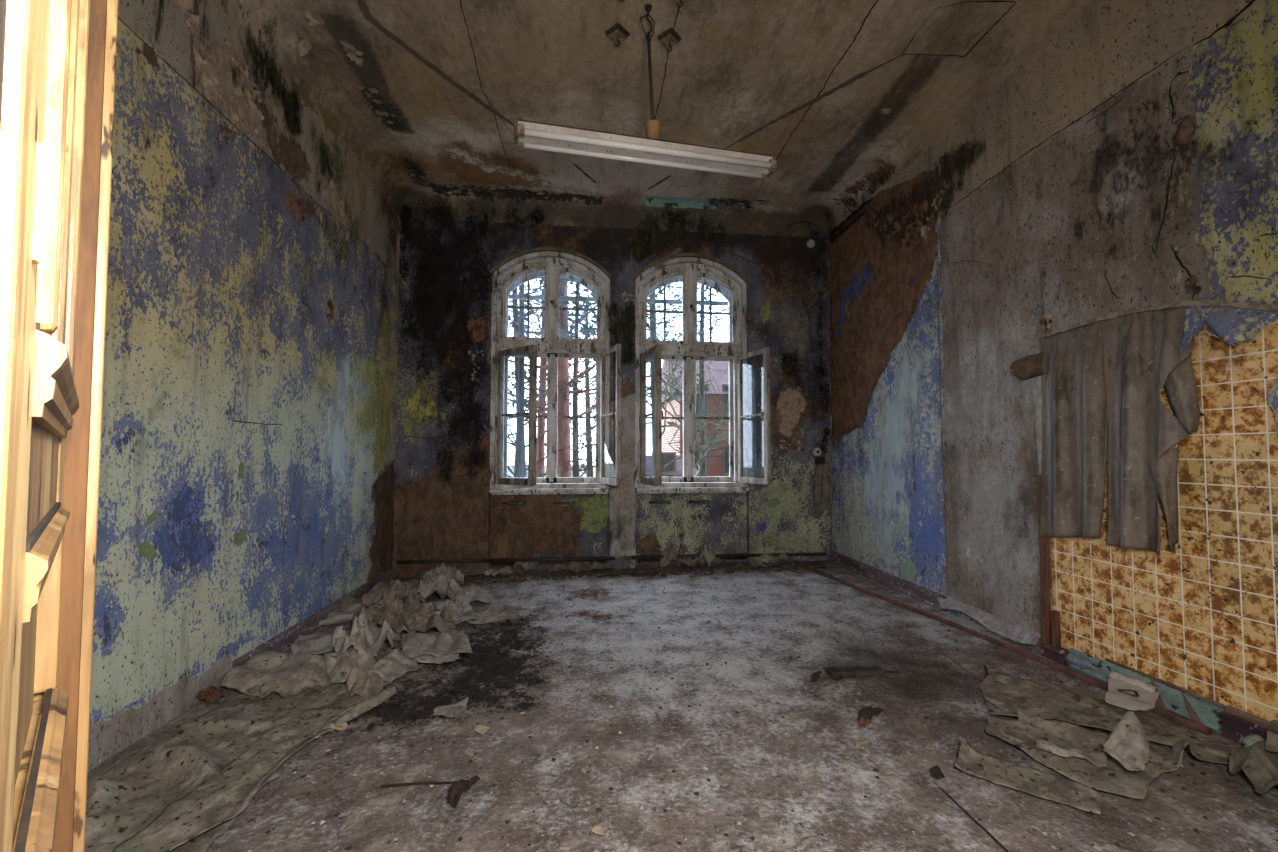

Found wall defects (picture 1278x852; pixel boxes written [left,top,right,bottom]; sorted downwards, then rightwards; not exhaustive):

spalling [175,0,324,227]
crack [460,0,524,227]
water stain [434,142,594,196]
crack [654,7,683,120]
crack [752,0,879,201]
water stain [1074,102,1233,240]
water stain [379,194,544,481]
spalling [829,190,943,445]
peeling [138,483,214,574]
water stain [321,346,395,505]
flaking render [775,387,833,519]
spalling [1105,658,1278,733]